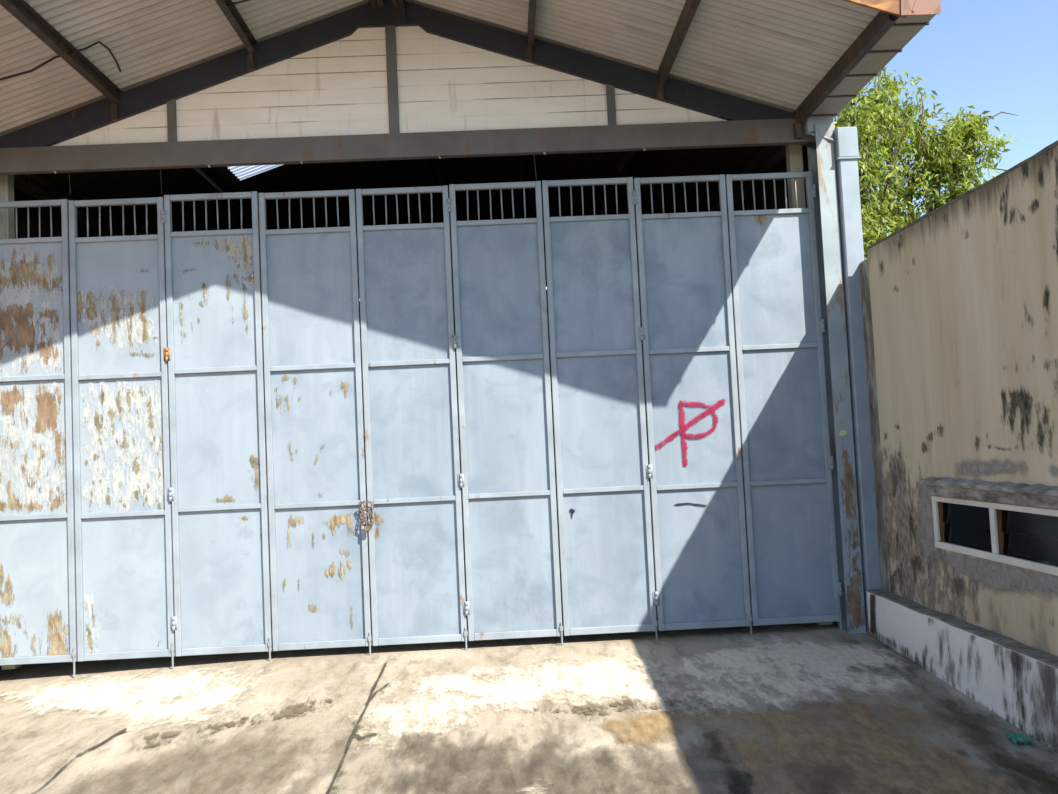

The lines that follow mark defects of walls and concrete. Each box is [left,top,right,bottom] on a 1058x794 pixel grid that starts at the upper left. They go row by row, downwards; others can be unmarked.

damp [1000,190,1038,224]
damp [1022,148,1058,255]
peeling [0,247,164,514]
damp [986,389,1052,451]
rust [840,450,866,632]
crack [326,663,388,794]
damp [394,644,1058,794]
damp [869,630,979,685]